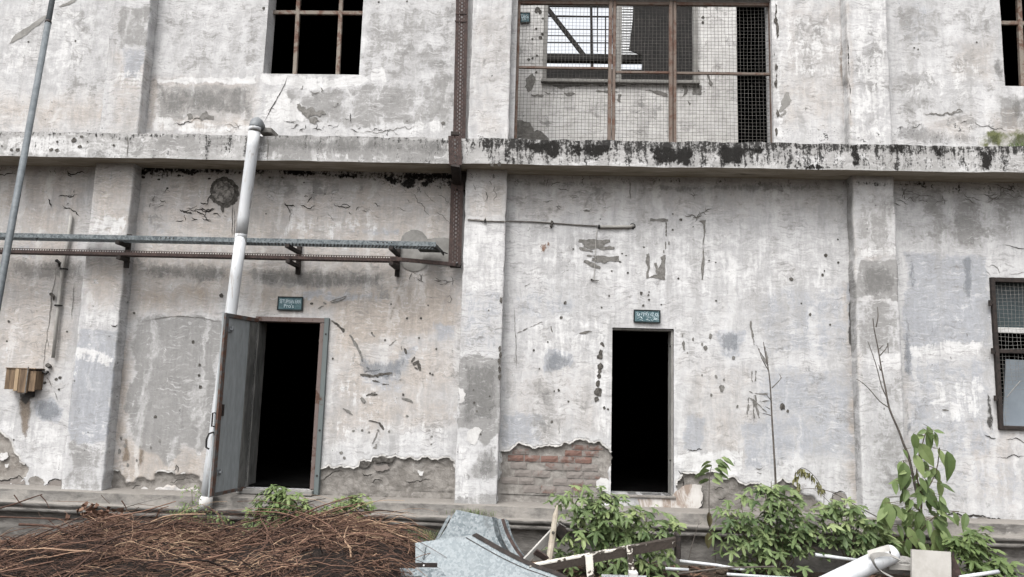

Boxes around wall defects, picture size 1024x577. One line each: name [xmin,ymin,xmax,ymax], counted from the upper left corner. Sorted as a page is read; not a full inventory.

damp [482,140,613,160]
mould [650,145,693,166]
mould [721,145,764,164]
damp [851,145,860,167]
damp [980,150,995,170]
mould [385,173,452,189]
spalling [573,239,629,274]
flaking render [0,430,62,486]
flaking render [111,437,202,491]
flaking render [320,420,455,499]
flaking render [497,438,612,504]
flaking render [638,470,848,512]